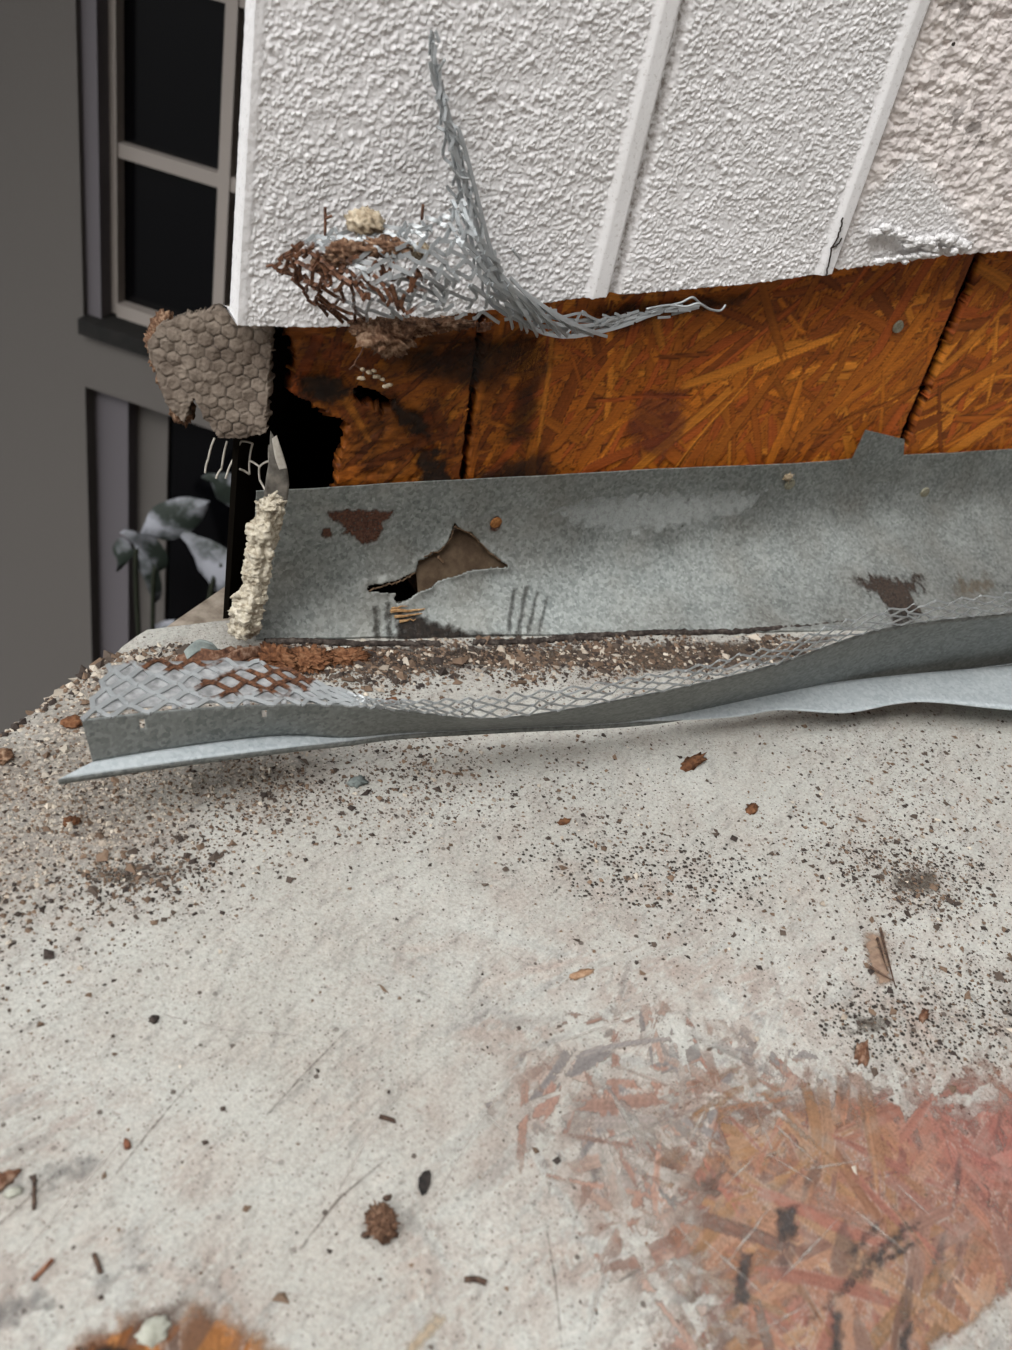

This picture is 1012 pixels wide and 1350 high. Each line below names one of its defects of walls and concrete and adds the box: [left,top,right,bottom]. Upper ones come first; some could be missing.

spalling [868,223,976,424]
corrosion [321,509,393,544]
peeling [416,523,508,592]